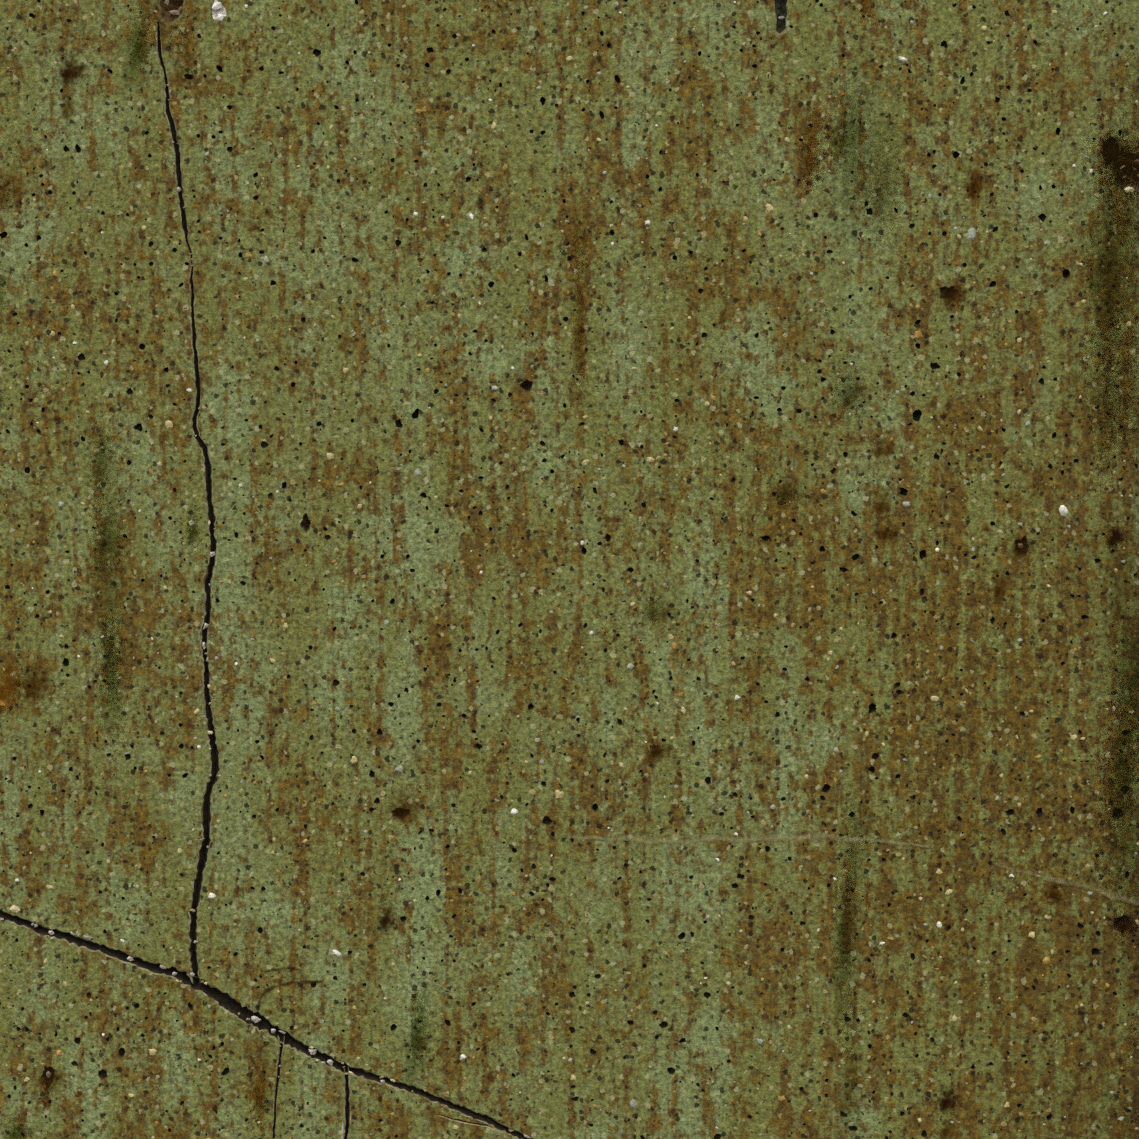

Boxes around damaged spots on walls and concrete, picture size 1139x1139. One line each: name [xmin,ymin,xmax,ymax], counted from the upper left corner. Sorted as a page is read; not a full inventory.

rust [59,53,85,82]
rust [1106,528,1124,546]
crack [0,22,534,1139]
rust [0,666,44,712]
crack [575,834,933,847]
crack [996,863,1139,904]
rust [378,907,395,929]
rust [938,1090,959,1112]